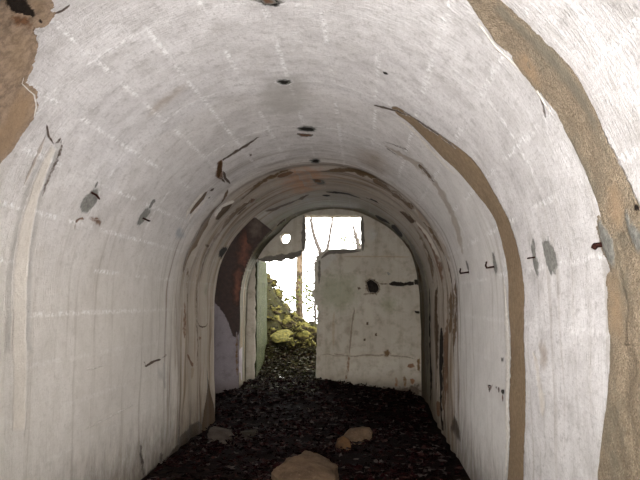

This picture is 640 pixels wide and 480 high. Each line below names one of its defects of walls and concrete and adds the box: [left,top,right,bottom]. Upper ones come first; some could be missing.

spalling [0,0,56,164]
crack [215,137,259,184]
corrosion [230,218,267,307]
crack [265,191,446,431]
spalling [374,105,526,480]
spalling [466,0,640,480]